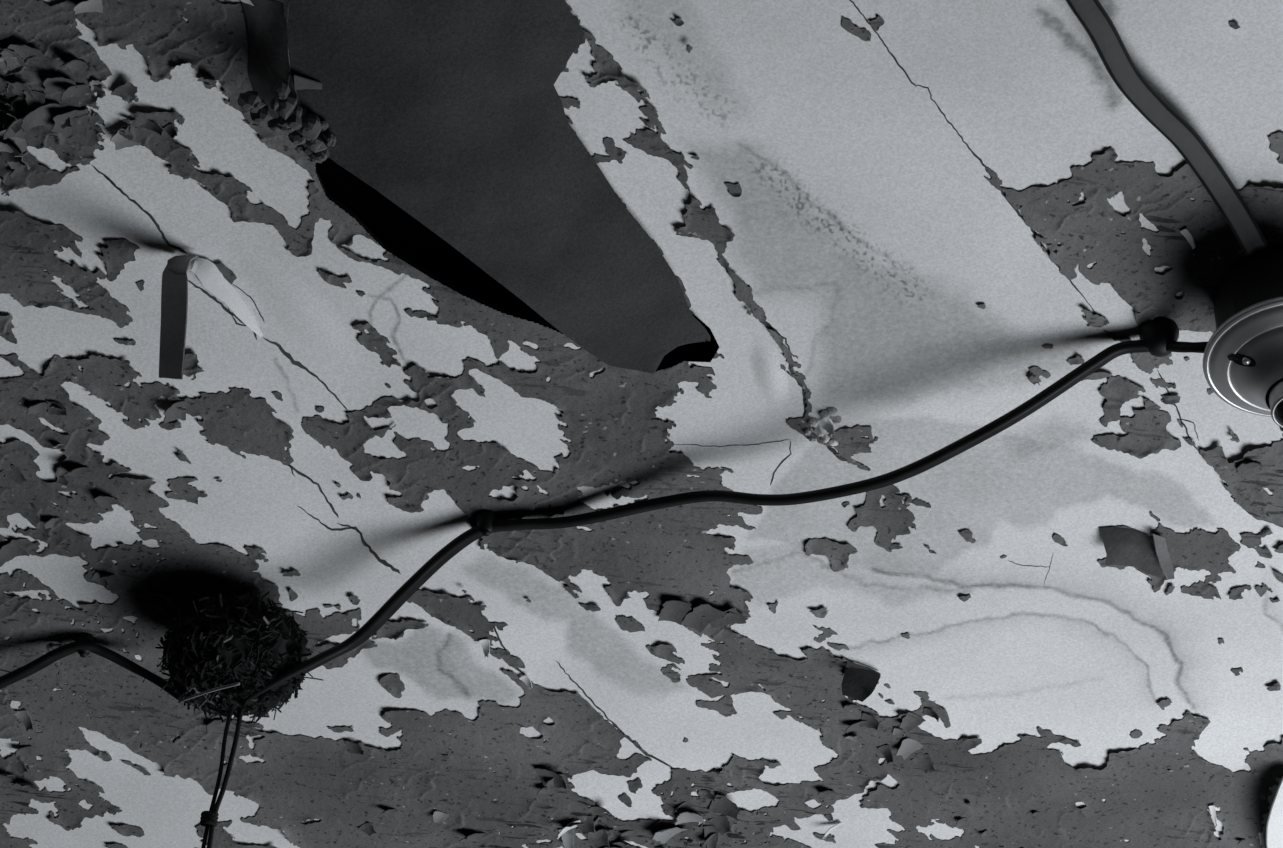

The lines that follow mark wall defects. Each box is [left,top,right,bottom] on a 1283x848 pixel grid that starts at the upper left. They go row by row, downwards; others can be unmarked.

crack [92,165,348,411]
crack [282,463,401,574]
peeling [0,0,884,528]
peeling [0,255,1283,848]
crack [849,0,1095,314]
peeling [984,147,1283,603]
peeling [1268,132,1283,164]